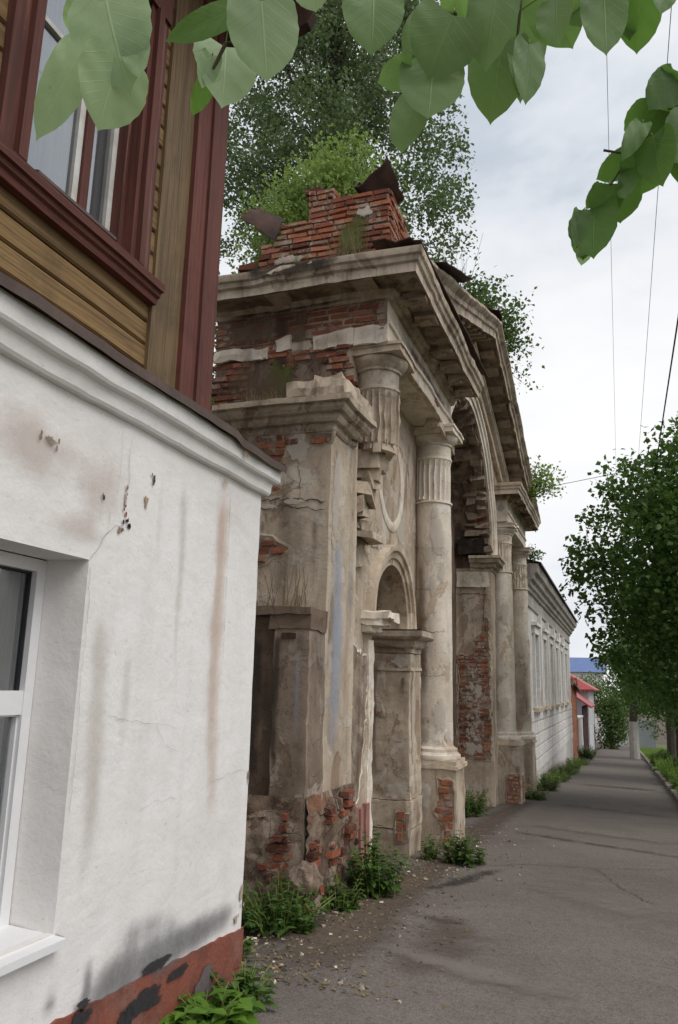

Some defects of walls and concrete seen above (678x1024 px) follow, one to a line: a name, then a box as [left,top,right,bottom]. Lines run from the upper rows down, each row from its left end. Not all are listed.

spalling [210,299,388,414]
spalling [39,430,60,452]
spalling [244,431,336,463]
spalling [263,481,303,509]
crack [261,464,325,511]
spalling [257,533,291,569]
spalling [421,617,494,763]
spalling [505,772,526,804]
spalling [431,776,458,850]
water stain [85,912,226,1000]